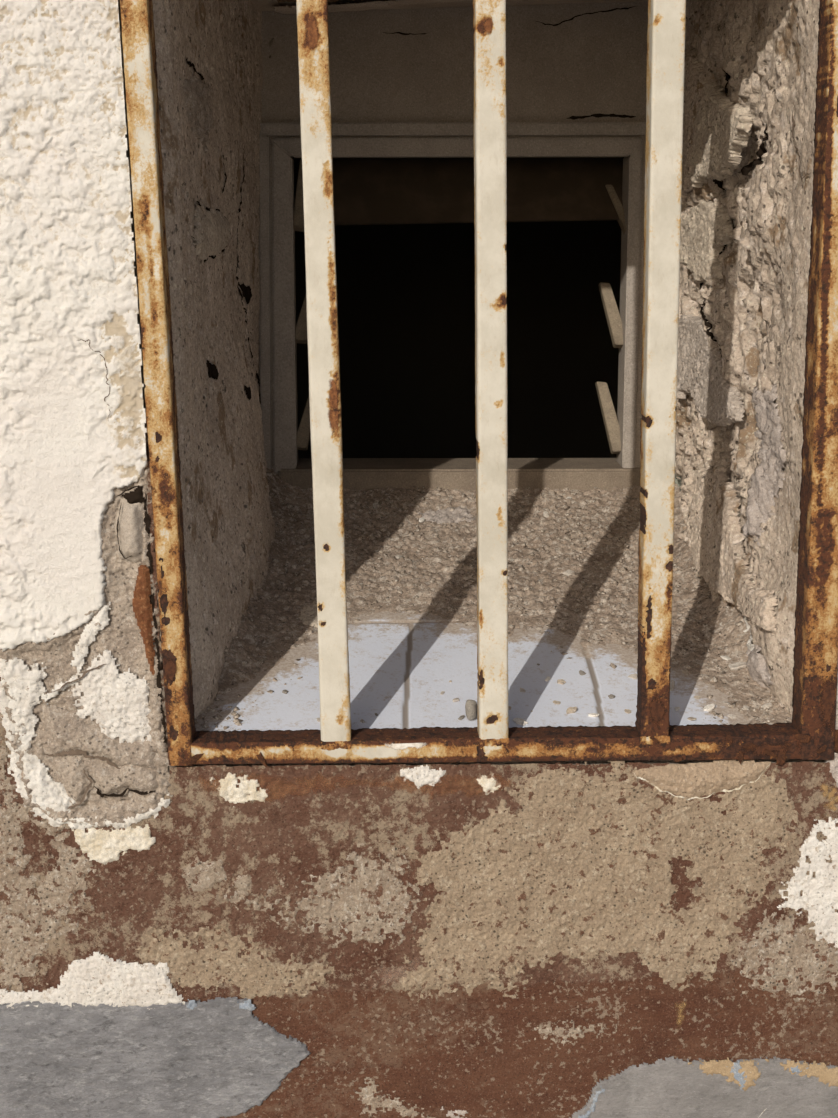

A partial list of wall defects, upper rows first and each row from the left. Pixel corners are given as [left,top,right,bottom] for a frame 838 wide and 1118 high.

rust [305,16,319,50]
rust [484,18,493,34]
rust [328,380,339,432]
rust [132,565,177,681]
rust [820,678,838,753]
rust [201,773,510,802]
peeling [0,467,838,1118]